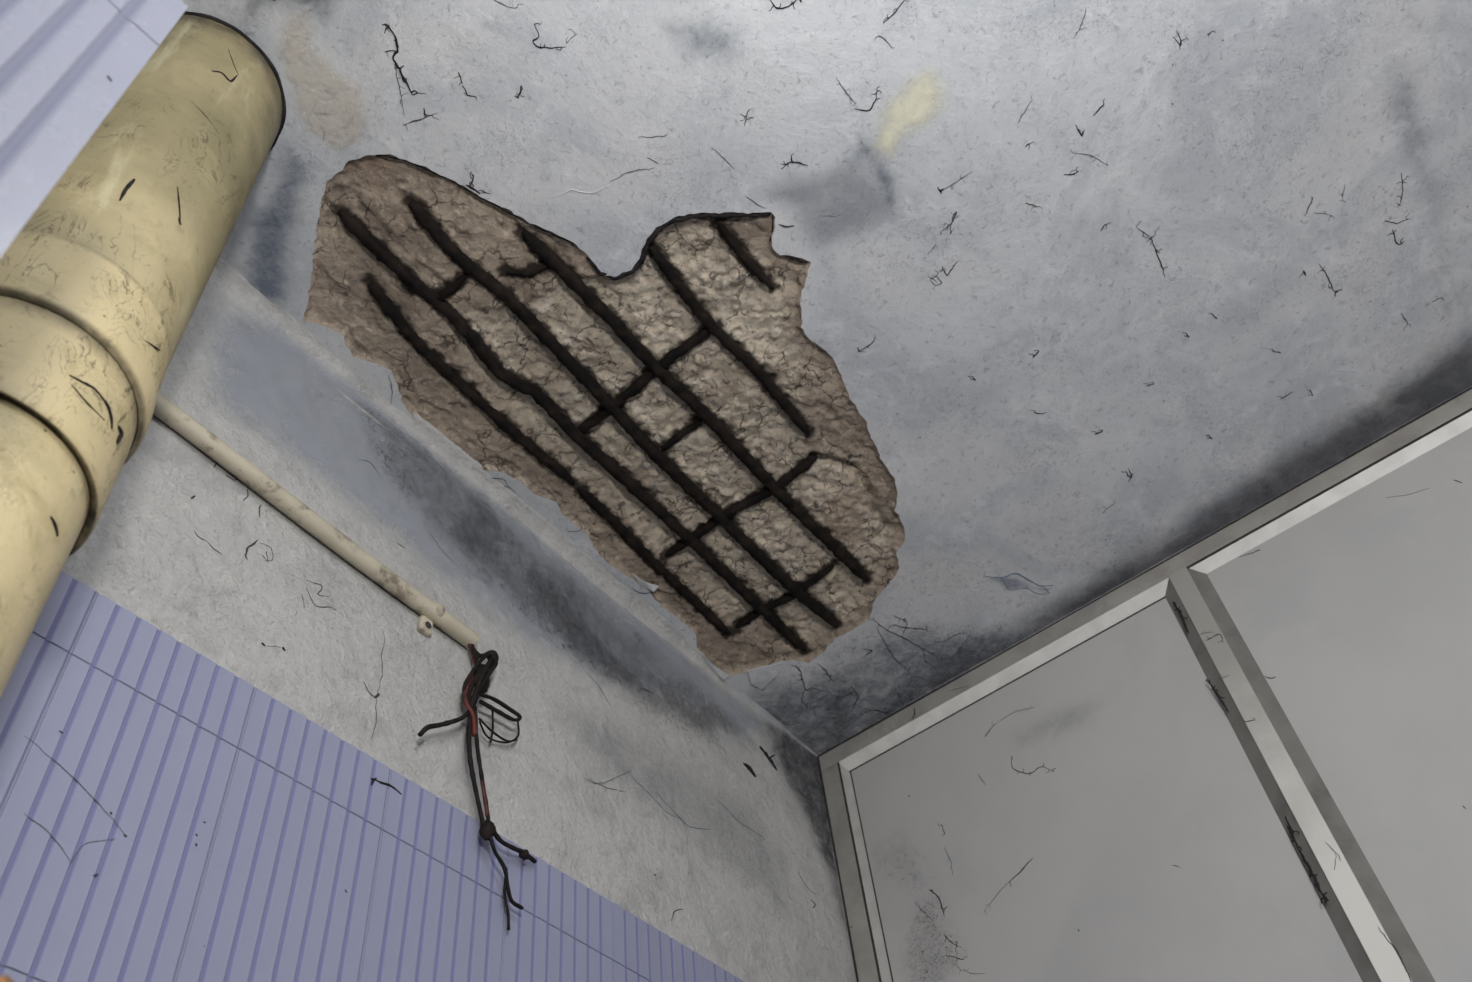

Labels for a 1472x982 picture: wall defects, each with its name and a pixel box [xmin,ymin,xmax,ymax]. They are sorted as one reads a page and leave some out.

spalling [303,154,905,689]
damp [759,624,1022,871]